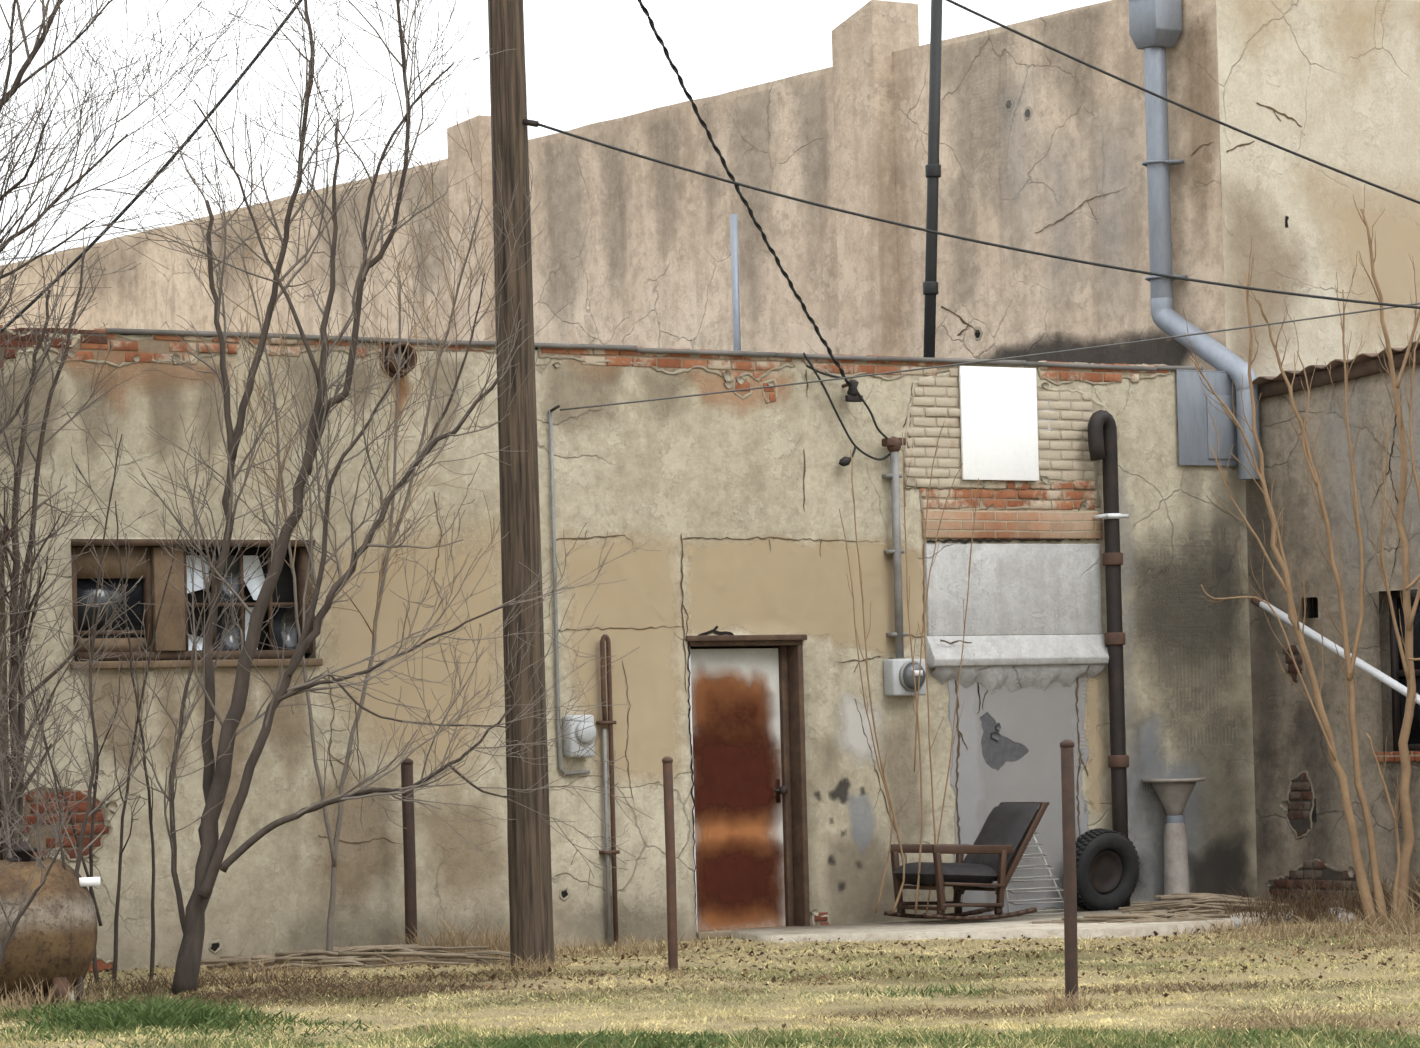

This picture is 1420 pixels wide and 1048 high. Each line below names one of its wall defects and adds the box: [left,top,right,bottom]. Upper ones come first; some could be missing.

crack [1035,190,1121,234]
spalling [0,325,496,370]
flaking render [538,347,1171,513]
spalling [980,711,1029,771]
flaking render [23,784,118,862]
corrosion [692,672,781,931]
flaking render [1280,771,1315,840]